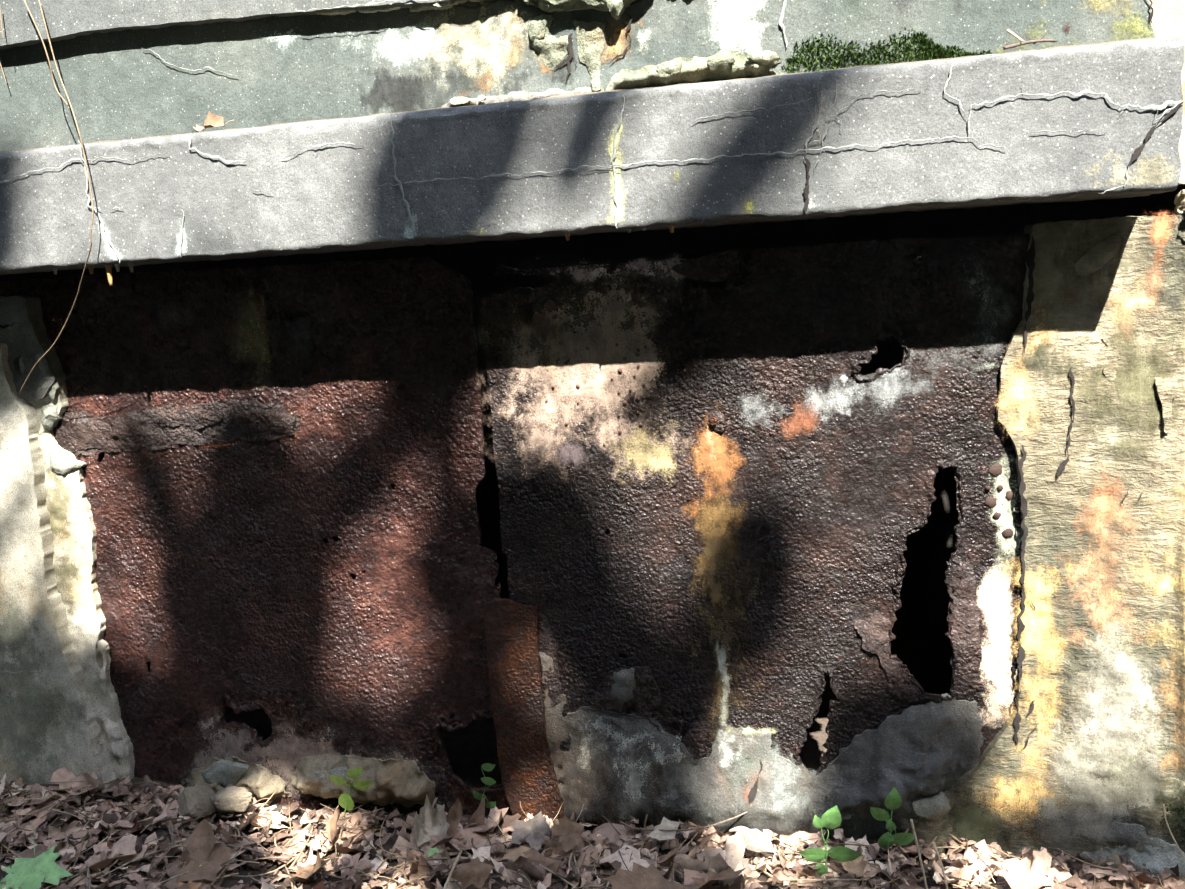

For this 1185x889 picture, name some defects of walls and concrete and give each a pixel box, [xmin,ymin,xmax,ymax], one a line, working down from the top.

crack [283,142,357,158]
crack [380,55,1185,239]
rust [997,302,1058,437]
rust [783,402,820,435]
rust [559,444,588,468]
rust [985,464,1018,538]
rust [685,418,760,736]